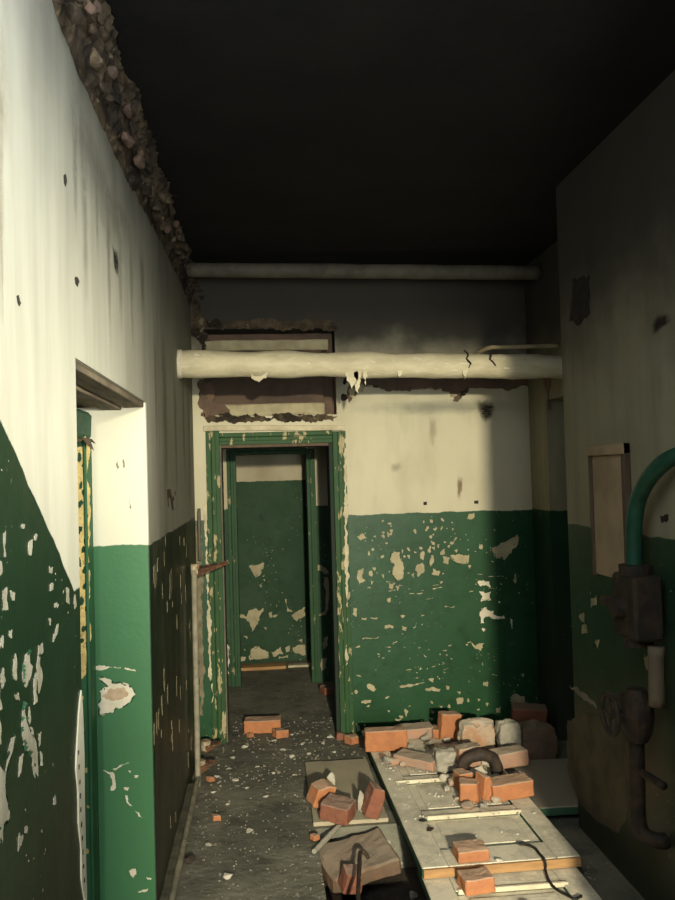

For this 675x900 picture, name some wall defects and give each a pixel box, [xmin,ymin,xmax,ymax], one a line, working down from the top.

spalling [52,0,338,350]
flaking render [197,379,337,424]
peeling [2,587,15,611]
peeling [0,618,59,843]
peeling [54,436,92,679]
flaking render [75,690,90,900]
peeling [98,676,135,716]
peeling [184,499,214,716]
peeling [240,599,305,639]
peeling [241,639,306,662]
peeling [343,439,471,631]
peeling [470,574,517,632]